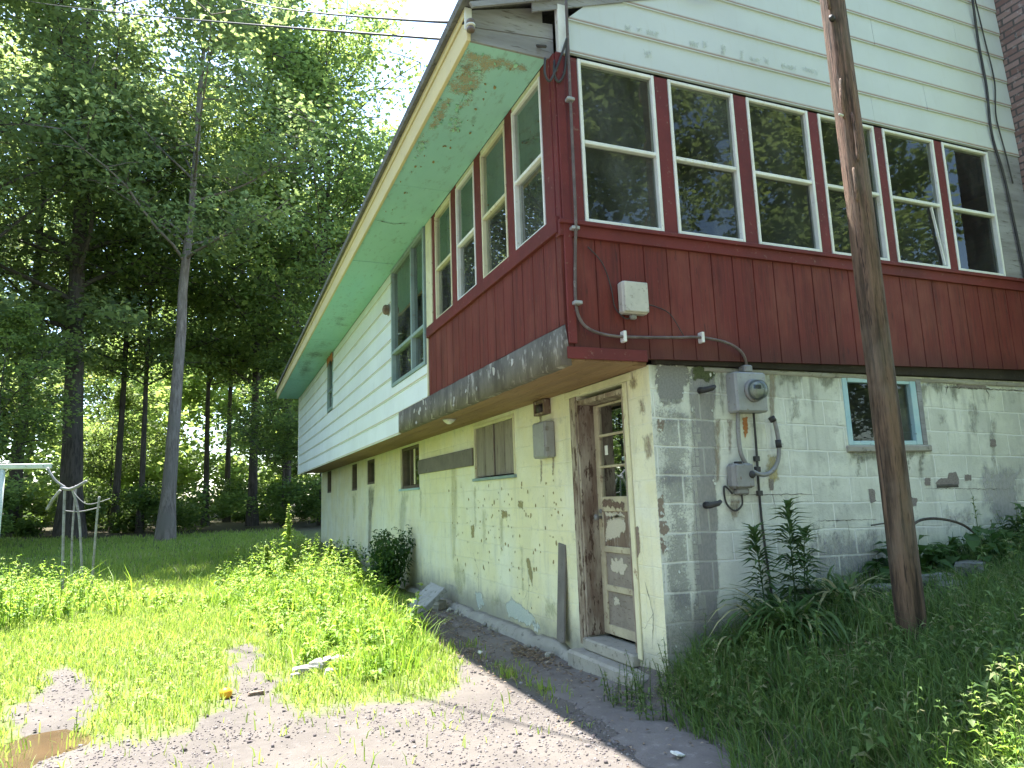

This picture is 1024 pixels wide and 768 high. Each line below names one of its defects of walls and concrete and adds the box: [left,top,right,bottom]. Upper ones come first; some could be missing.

peeling [411,52,525,172]
peeling [456,479,563,575]
peeling [655,364,719,650]
spalling [925,472,971,488]
peeling [506,544,541,633]